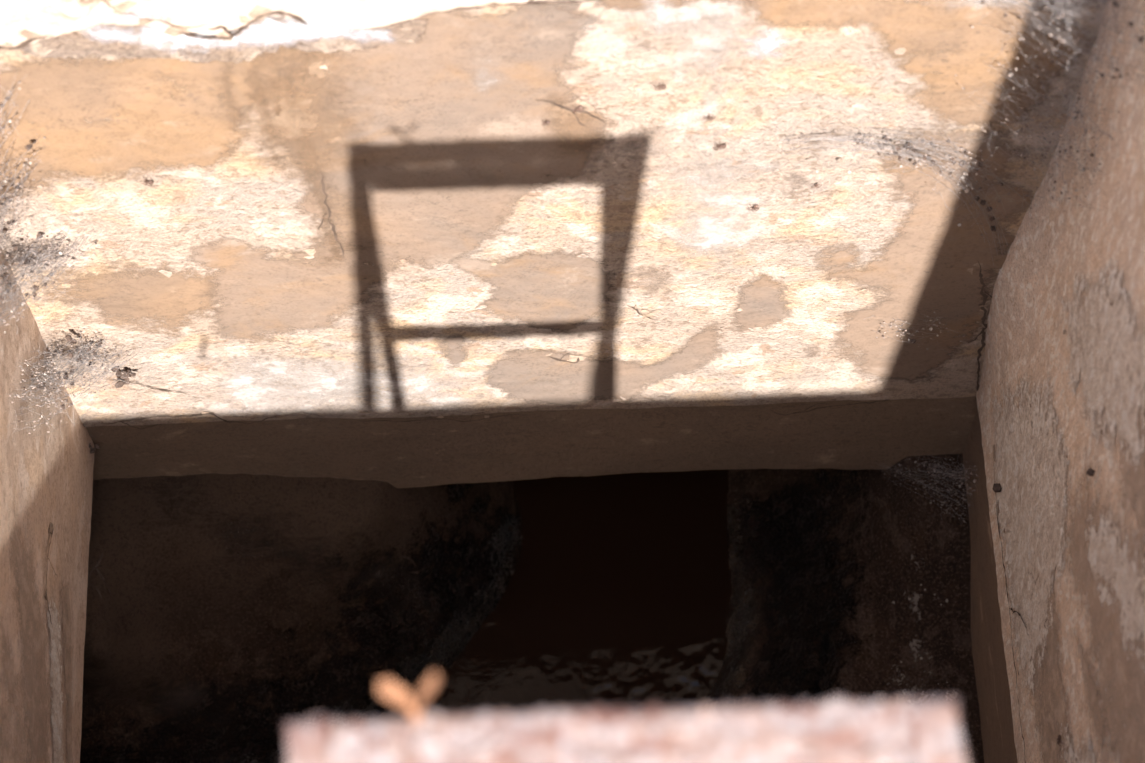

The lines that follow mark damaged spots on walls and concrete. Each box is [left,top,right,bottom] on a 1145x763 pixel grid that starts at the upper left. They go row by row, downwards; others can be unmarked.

leakage [90,13,389,209]
leakage [551,99,602,154]
crack [967,260,992,391]
leakage [3,483,523,763]
leakage [728,469,873,706]